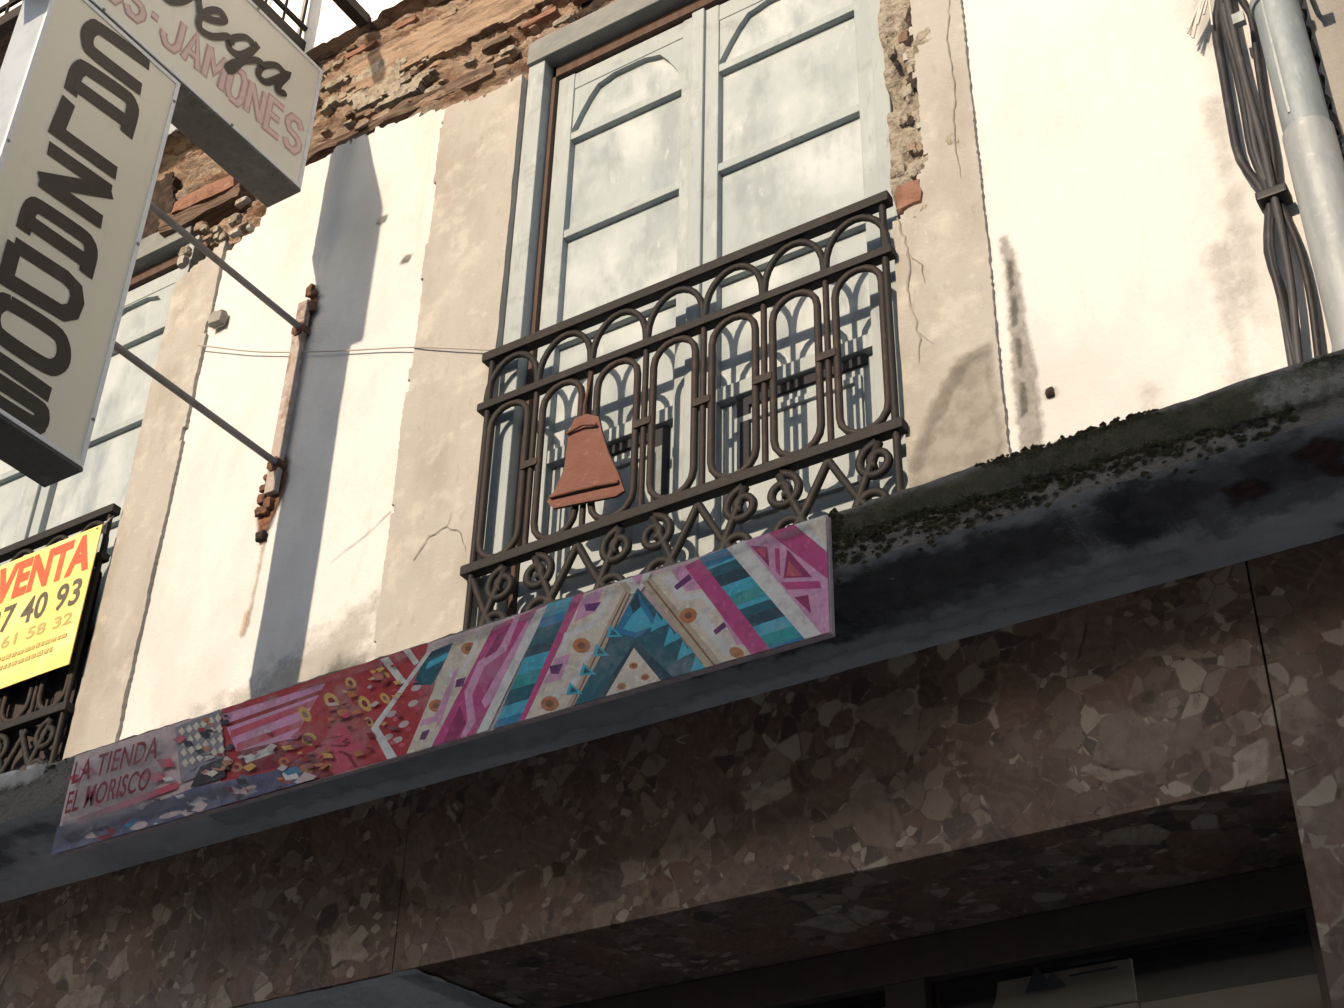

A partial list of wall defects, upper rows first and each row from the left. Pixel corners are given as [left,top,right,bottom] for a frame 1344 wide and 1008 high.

flaking render [305,0,617,166]
spalling [878,0,932,219]
rust [305,283,319,327]
rust [1291,438,1344,476]
rust [240,456,289,635]